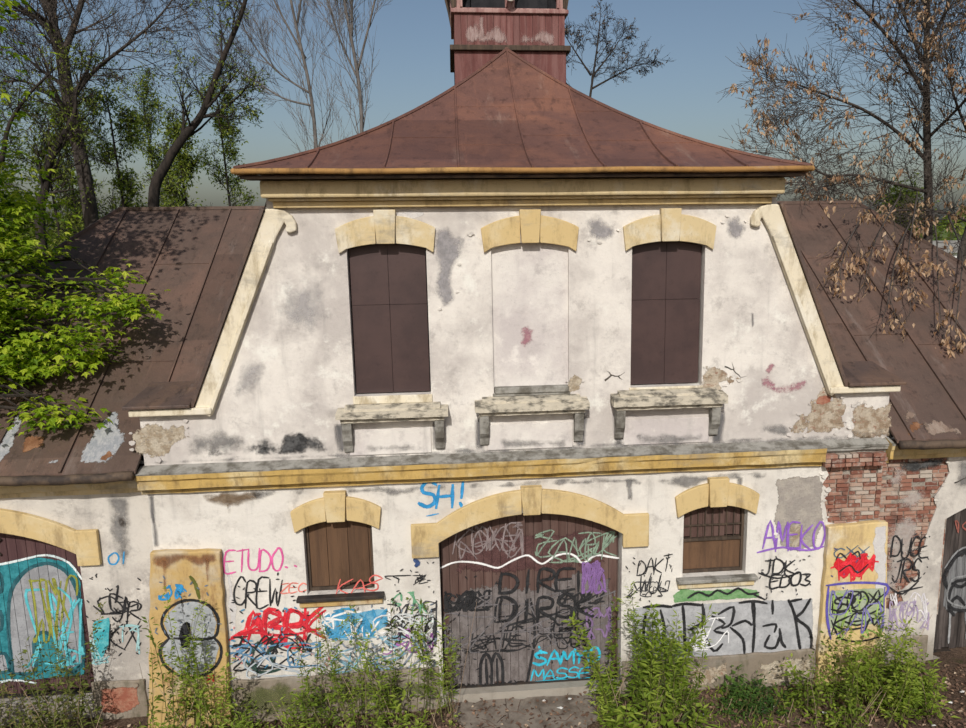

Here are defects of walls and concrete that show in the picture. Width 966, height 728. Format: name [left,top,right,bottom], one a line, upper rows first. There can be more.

peeling [466,17,507,42]
flaking render [702,366,742,390]
flaking render [787,387,917,439]
flaking render [129,419,190,463]
damp [196,436,239,453]
damp [252,433,324,460]
damp [335,425,350,458]
flaking render [774,451,950,614]